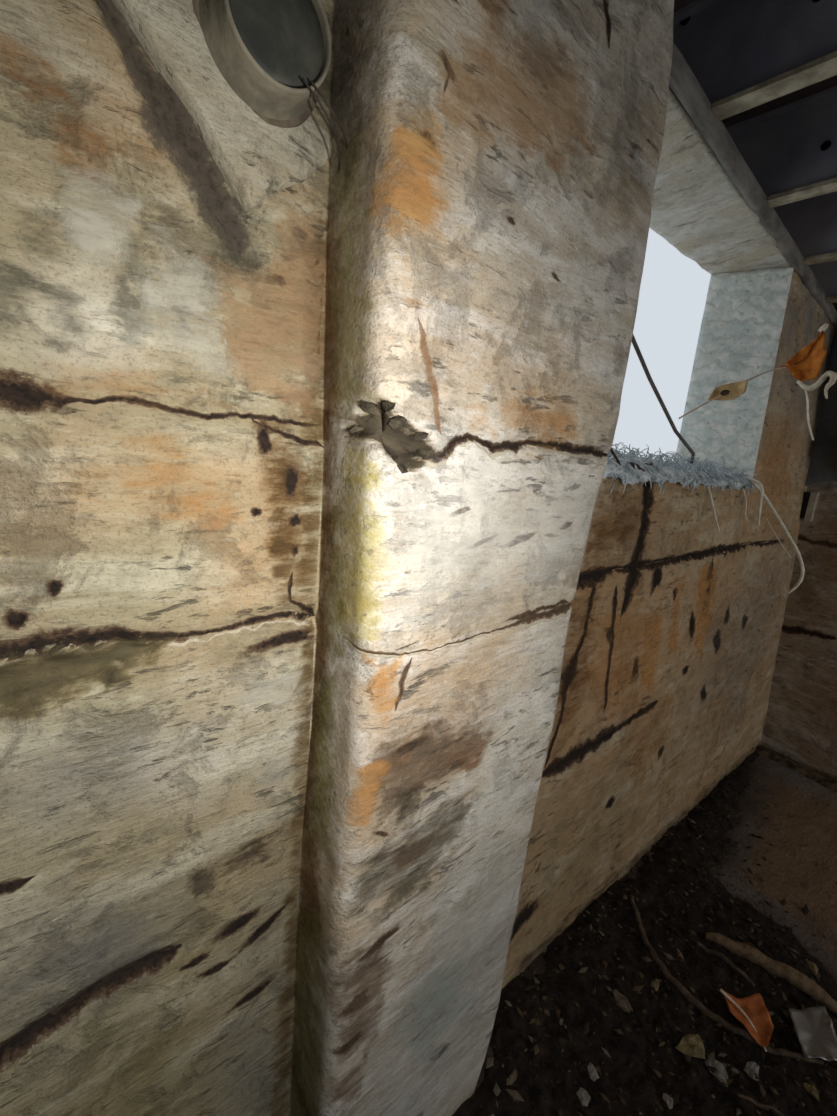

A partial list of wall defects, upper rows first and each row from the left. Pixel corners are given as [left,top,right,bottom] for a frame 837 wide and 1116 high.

crack [0,370,609,468]
spalling [349,400,434,474]
crack [0,572,316,667]
crack [343,462,784,777]